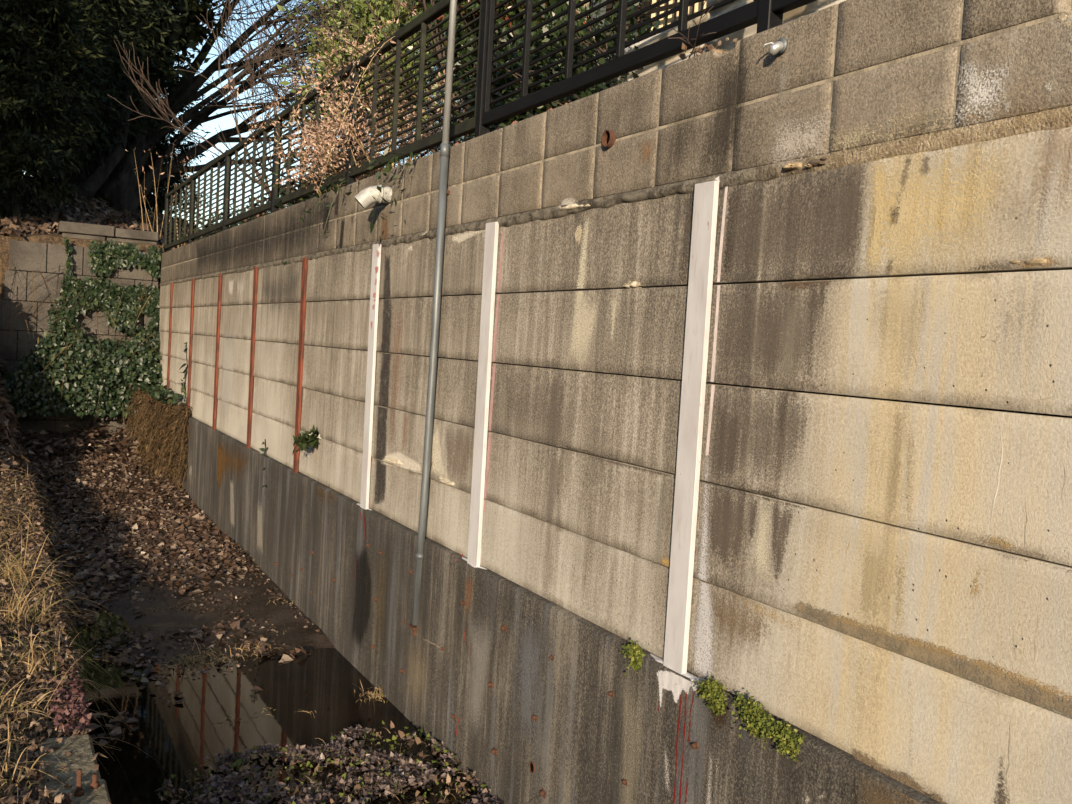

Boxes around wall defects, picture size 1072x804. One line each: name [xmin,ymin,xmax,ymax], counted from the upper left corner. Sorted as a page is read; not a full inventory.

crack [991,396,1056,527]
water stain [736,486,805,577]
water stain [352,546,372,646]
water stain [456,621,491,736]
water stain [712,595,793,644]
water stain [795,602,1072,718]